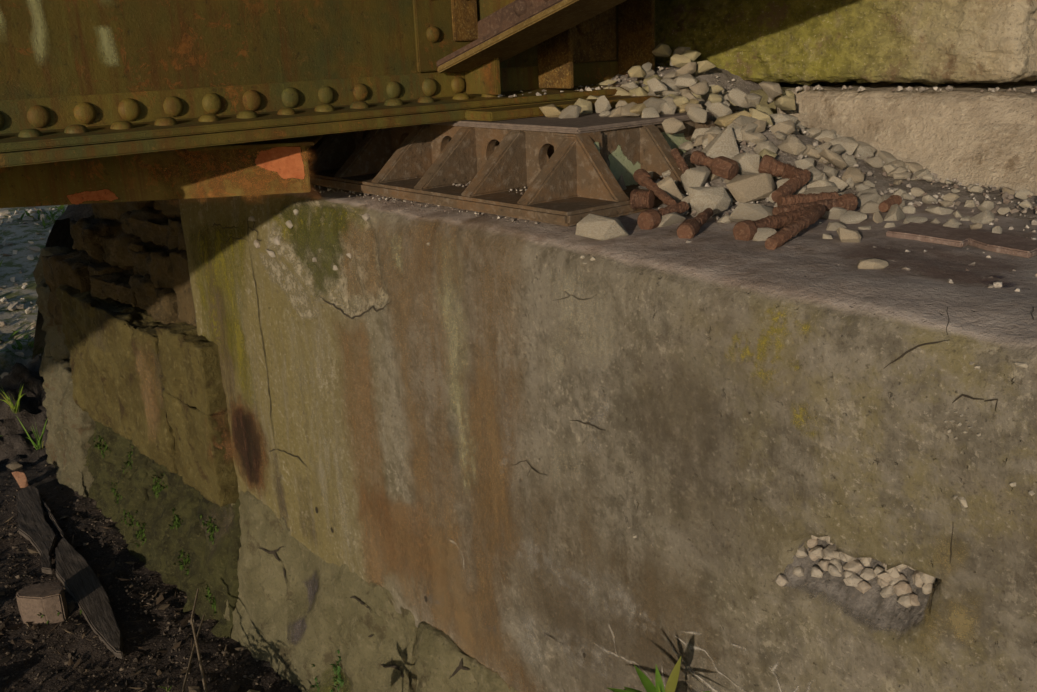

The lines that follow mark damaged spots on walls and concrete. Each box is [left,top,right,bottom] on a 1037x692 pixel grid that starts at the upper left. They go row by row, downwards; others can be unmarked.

peeling [254,146,305,179]
spalling [254,200,392,319]
crack [884,307,949,368]
spalling [775,535,941,633]